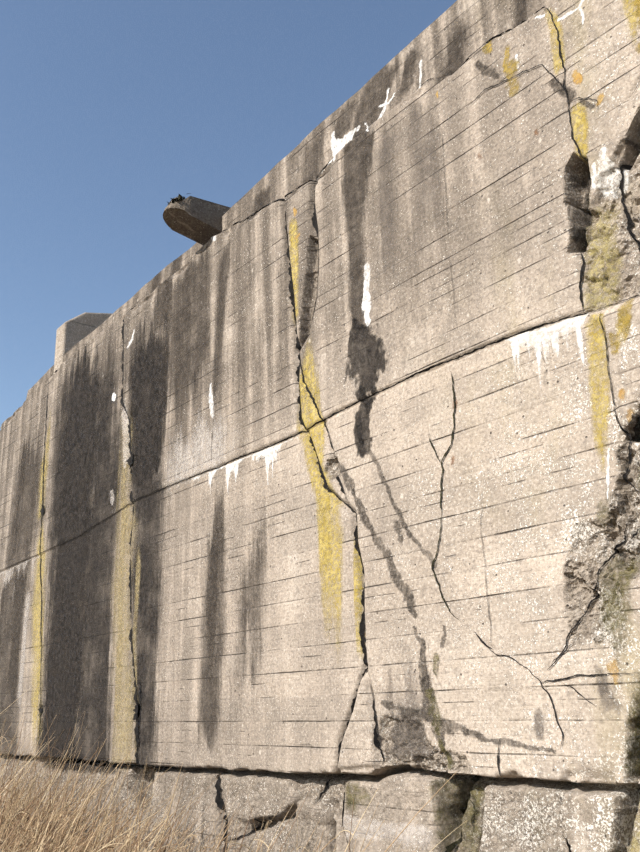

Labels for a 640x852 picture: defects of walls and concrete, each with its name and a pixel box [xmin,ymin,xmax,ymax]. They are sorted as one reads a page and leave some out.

spalling [562,102,640,315]
water stain [508,314,588,370]
water stain [0,248,229,773]
crack [120,306,165,819]
water stain [208,441,287,487]
crack [215,157,385,852]
water stain [339,465,381,543]
crack [429,371,458,619]
water stain [381,552,554,761]
crack [474,518,640,852]
spalling [560,439,640,650]
crack [438,740,501,852]